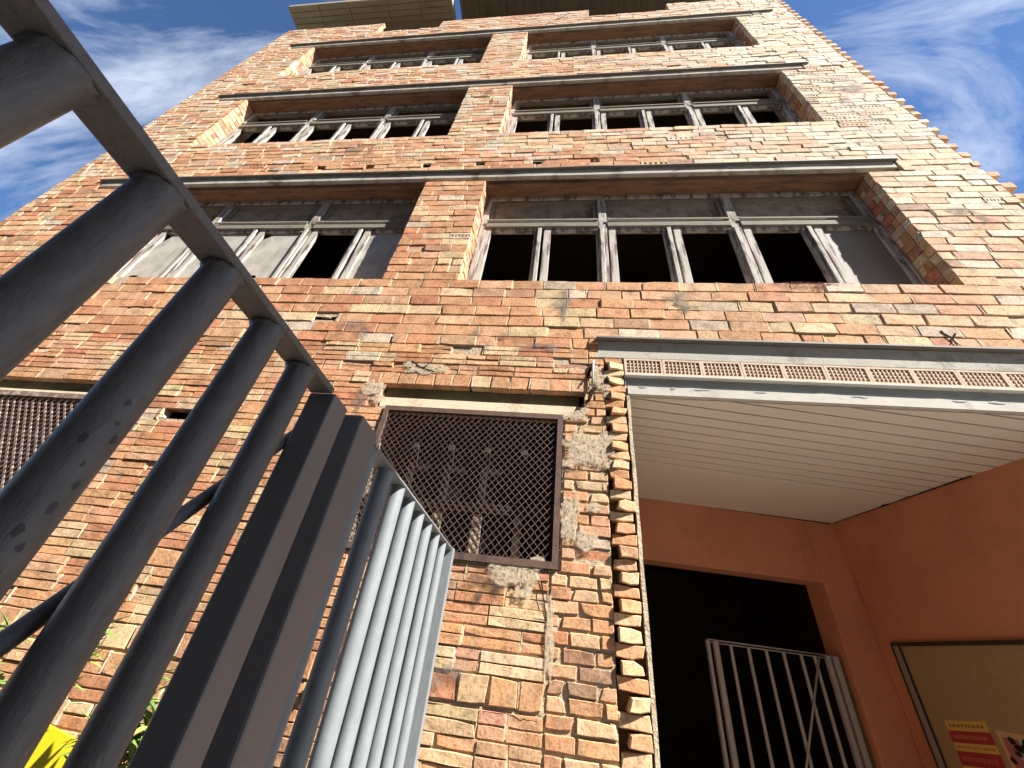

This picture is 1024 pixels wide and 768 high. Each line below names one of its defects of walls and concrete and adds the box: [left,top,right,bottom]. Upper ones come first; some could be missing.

spalling [404,361,450,374]
peeling [576,530,598,552]
peeling [515,583,533,601]